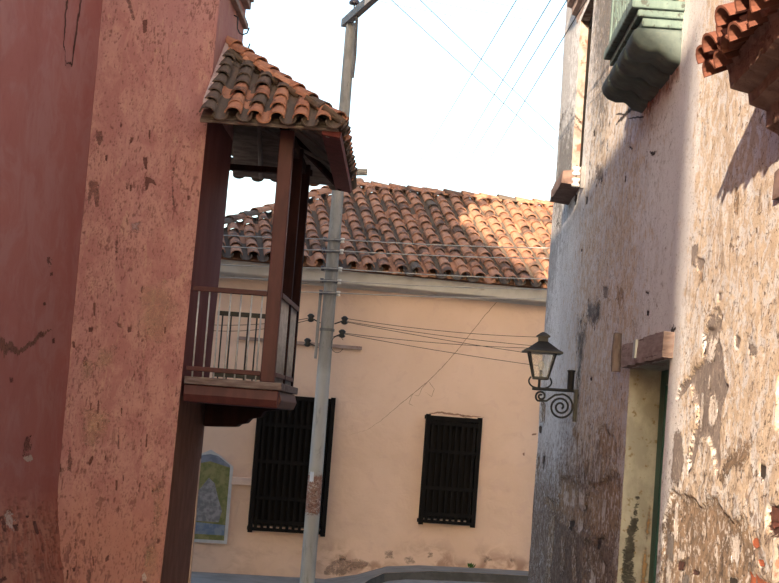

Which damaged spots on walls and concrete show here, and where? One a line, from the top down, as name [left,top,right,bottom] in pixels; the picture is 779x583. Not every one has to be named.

crack [63,0,82,67]
peeling [691,244,705,281]
crack [0,329,51,357]
peeling [659,293,766,583]
peeling [544,423,621,583]
spalling [768,505,779,556]